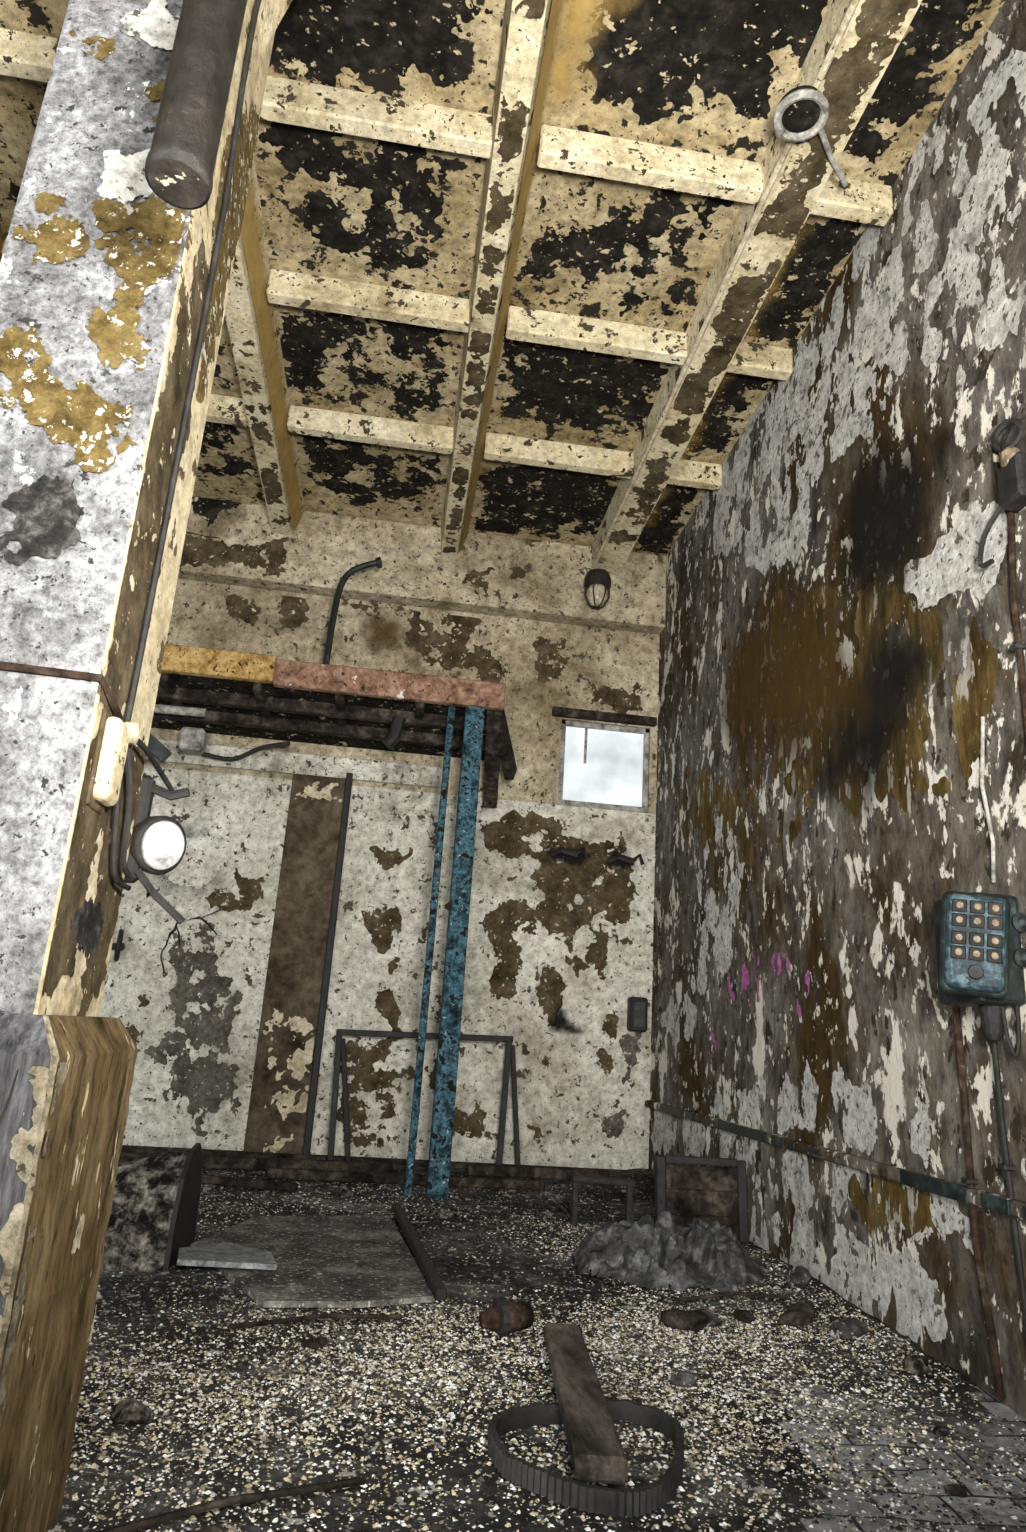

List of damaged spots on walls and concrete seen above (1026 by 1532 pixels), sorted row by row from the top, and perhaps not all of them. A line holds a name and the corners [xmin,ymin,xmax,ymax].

peeling [69,0,180,61]
peeling [0,102,451,1006]
peeling [270,0,1026,1055]
leakage [822,631,929,800]
spalling [9,1062,68,1183]
peeling [125,850,270,1137]
peeling [263,1008,314,1153]
peeling [332,905,403,1148]
peeling [453,1093,491,1139]
peeling [520,1043,553,1067]
peeling [590,1014,642,1139]
spalling [0,1202,37,1412]